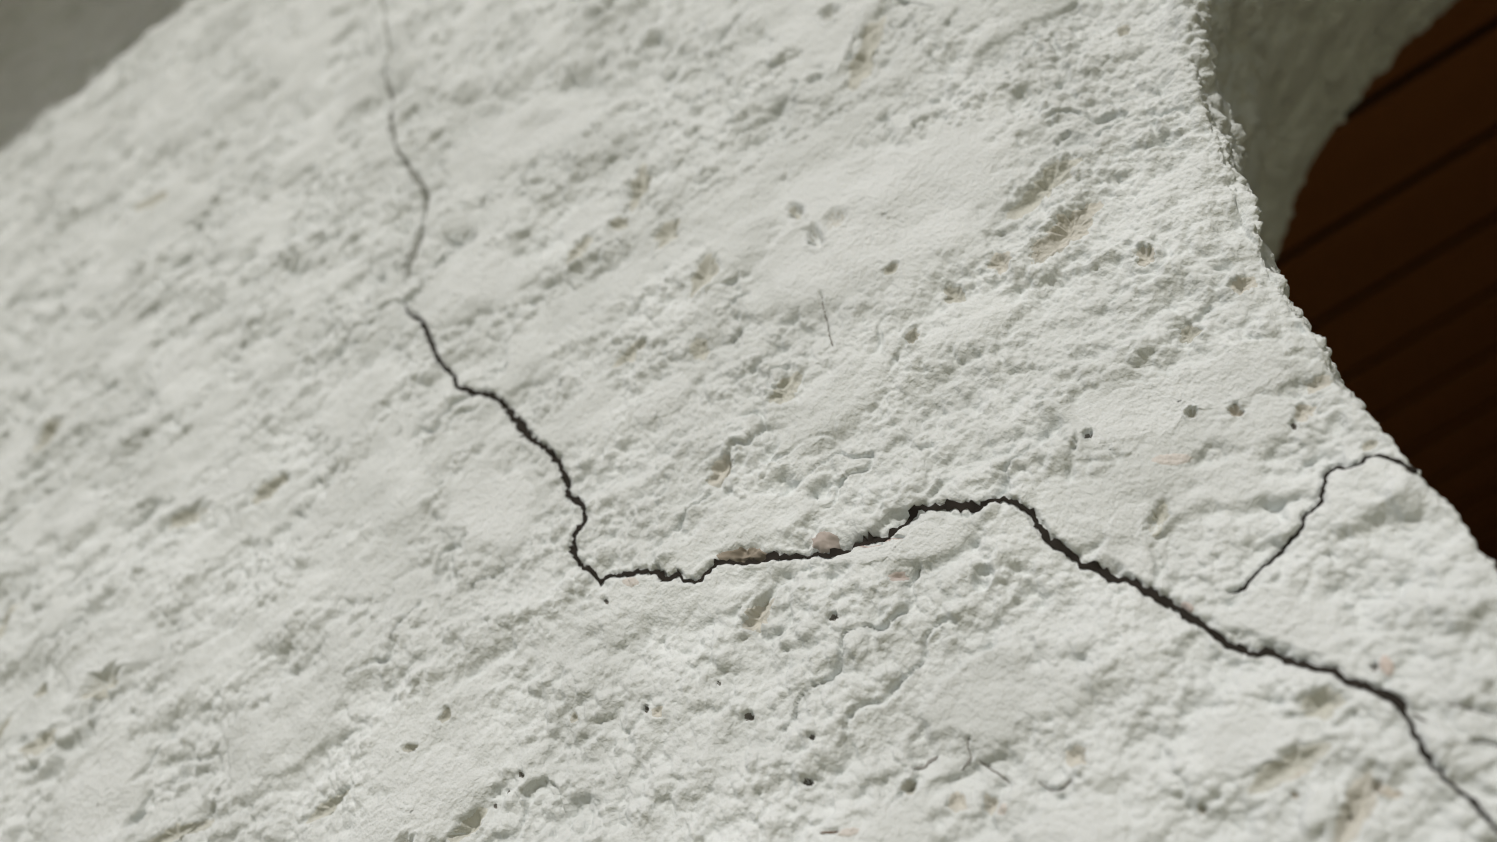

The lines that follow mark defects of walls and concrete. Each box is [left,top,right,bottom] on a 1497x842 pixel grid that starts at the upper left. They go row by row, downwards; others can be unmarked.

crack [379,0,1497,833]